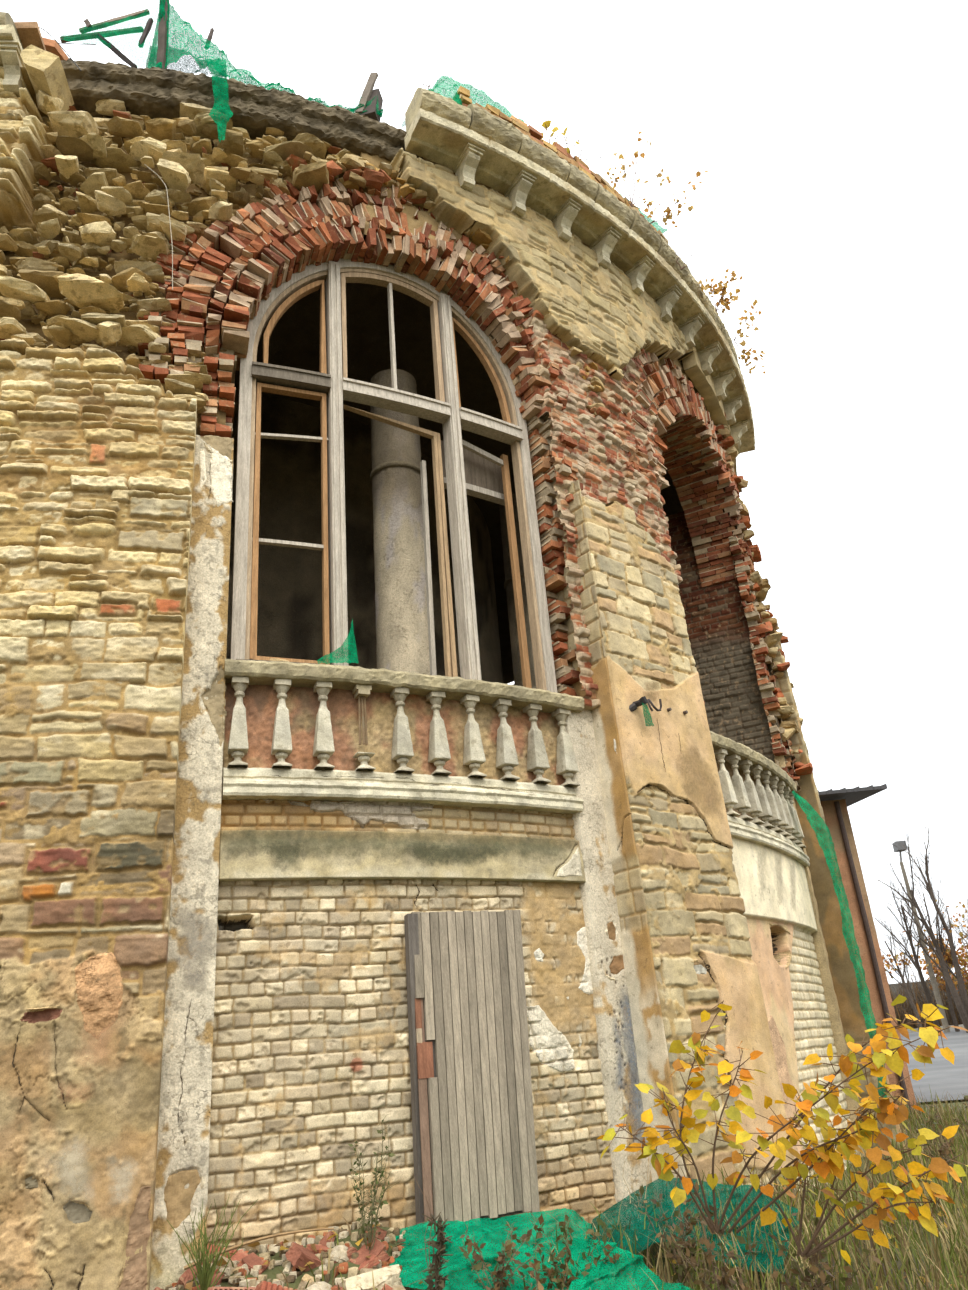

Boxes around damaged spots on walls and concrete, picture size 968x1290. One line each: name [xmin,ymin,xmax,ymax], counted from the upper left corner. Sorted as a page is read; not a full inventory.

spalling [711,412,813,780]
spalling [691,959,707,974]
spalling [769,923,792,968]
crack [12,1025,66,1121]
peeling [768,1015,790,1107]
crack [45,1265,85,1290]